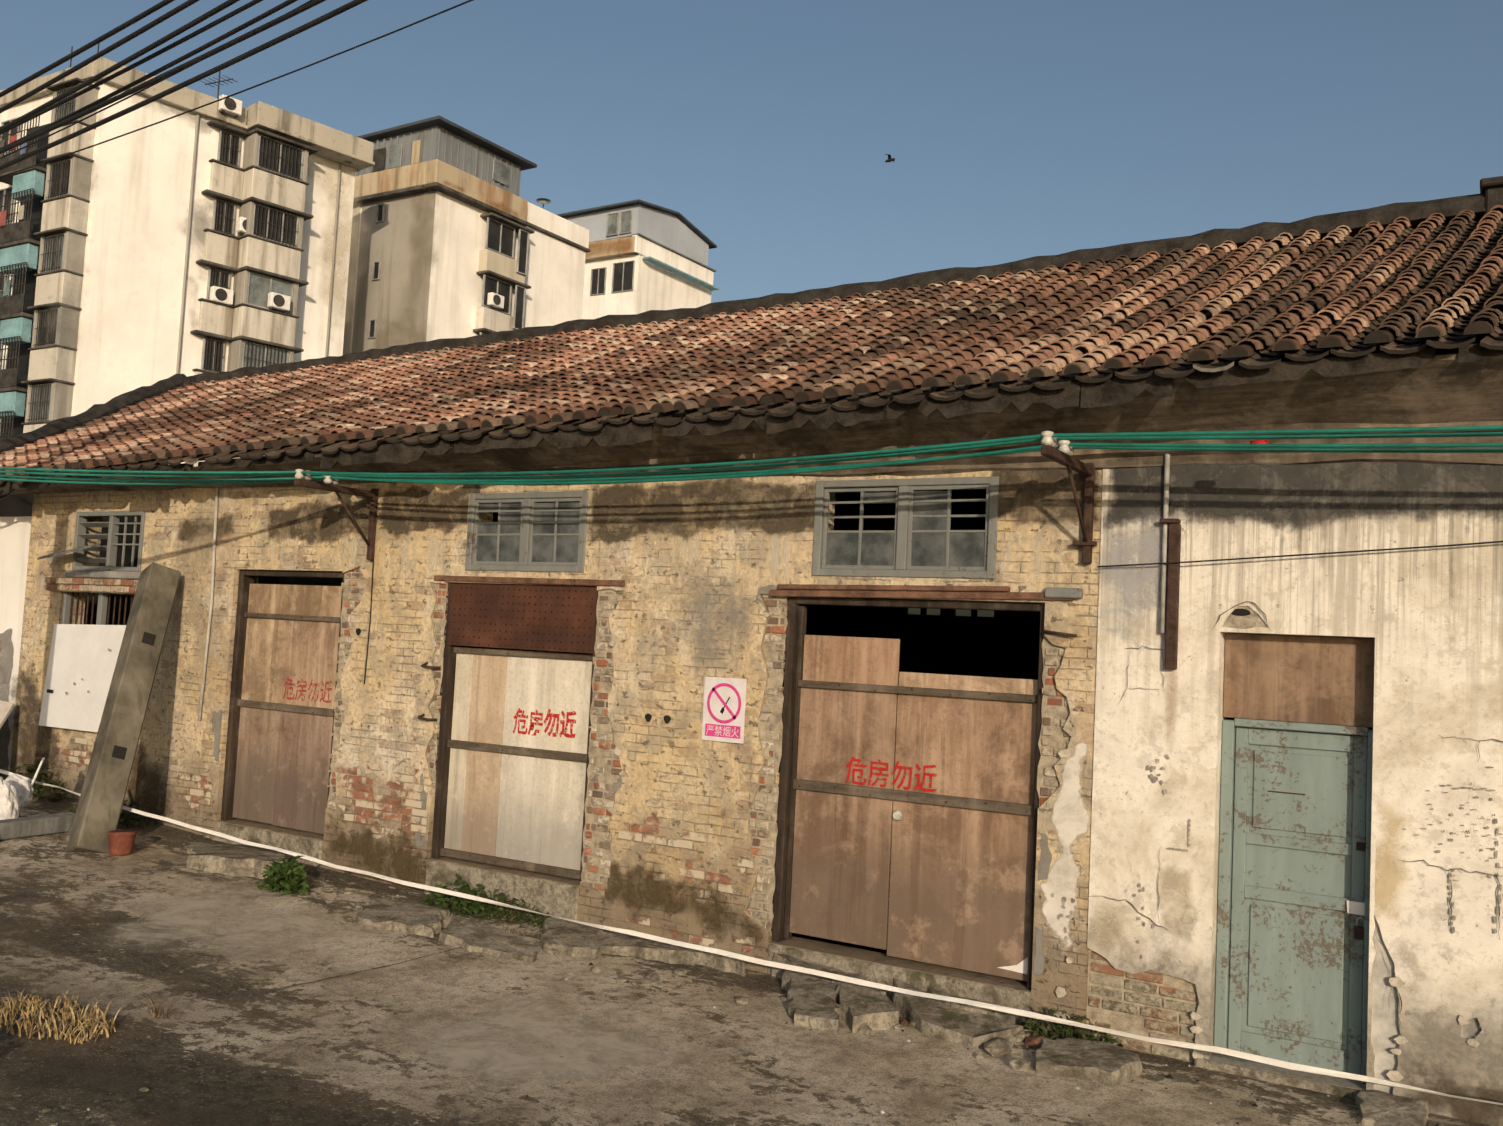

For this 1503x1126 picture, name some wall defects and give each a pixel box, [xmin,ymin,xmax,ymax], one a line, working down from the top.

damp [592,478,816,573]
rust [1159,518,1181,670]
damp [992,462,1503,614]
peeling [327,567,449,856]
flaking render [581,589,788,952]
flaking render [1045,883,1204,1063]